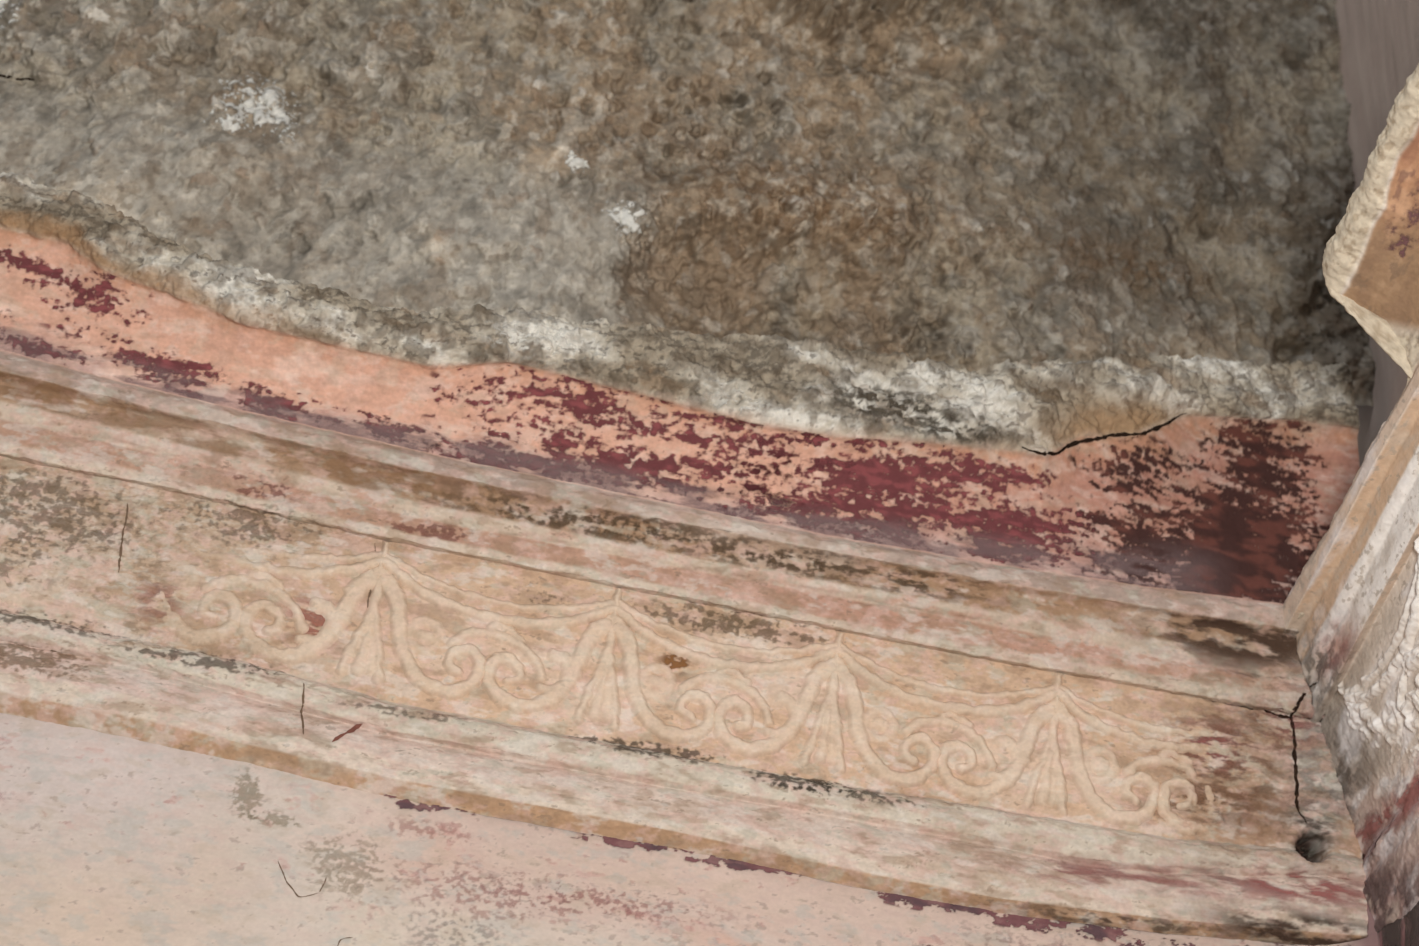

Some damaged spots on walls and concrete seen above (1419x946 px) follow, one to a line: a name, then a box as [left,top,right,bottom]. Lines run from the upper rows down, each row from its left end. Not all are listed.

flaking render [0,0,1419,604]
crack [1022,413,1187,456]
crack [1264,682,1317,823]
peeling [384,794,474,815]
peeling [572,834,800,877]
peeling [877,892,1145,946]